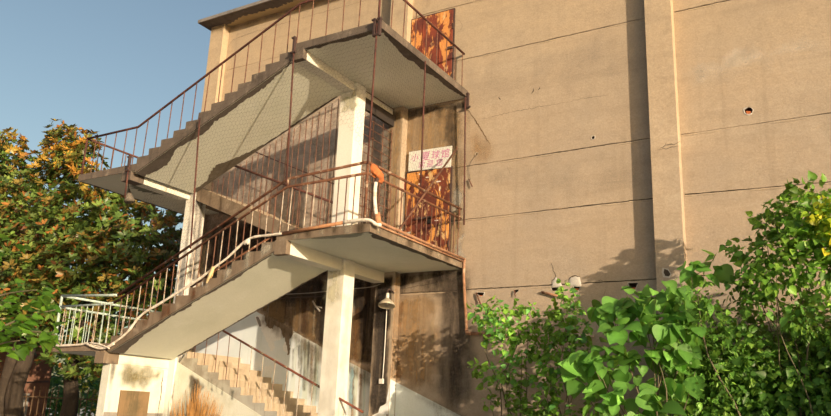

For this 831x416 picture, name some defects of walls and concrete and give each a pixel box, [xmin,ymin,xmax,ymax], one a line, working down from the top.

leakage [213,93,465,257]
leakage [178,201,277,295]
leakage [261,270,337,378]
leakage [349,271,471,414]